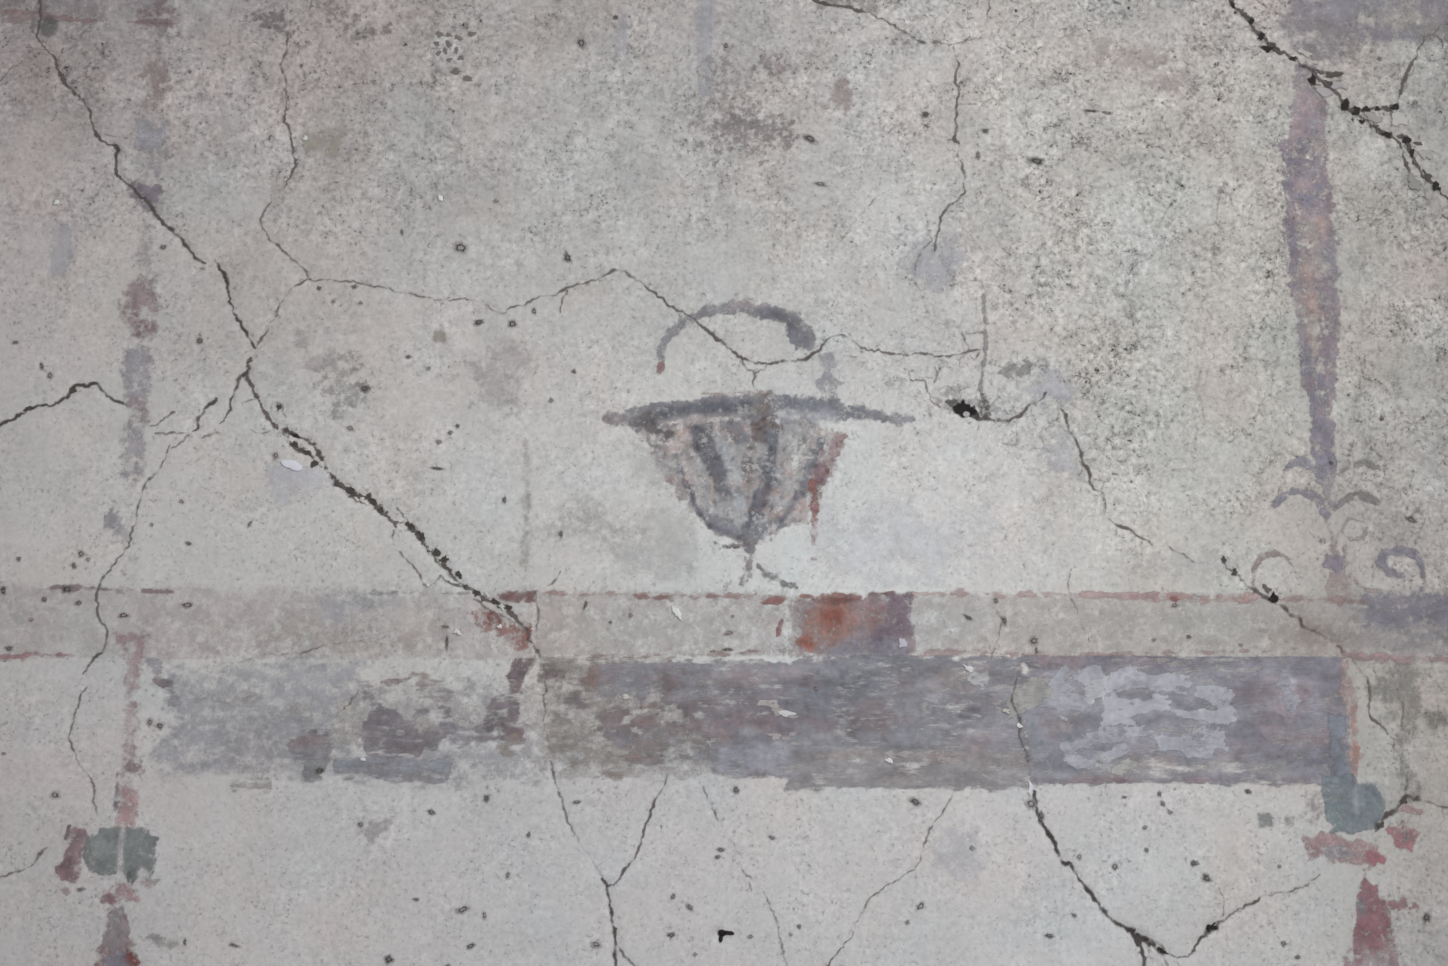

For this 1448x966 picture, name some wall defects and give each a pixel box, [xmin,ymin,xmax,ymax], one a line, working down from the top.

crack [1229,0,1448,219]
crack [0,0,1343,808]
crack [551,762,573,831]
crack [601,779,667,966]
crack [865,799,951,906]
crack [1033,790,1319,966]
crack [1367,680,1404,747]
crack [1375,780,1448,832]